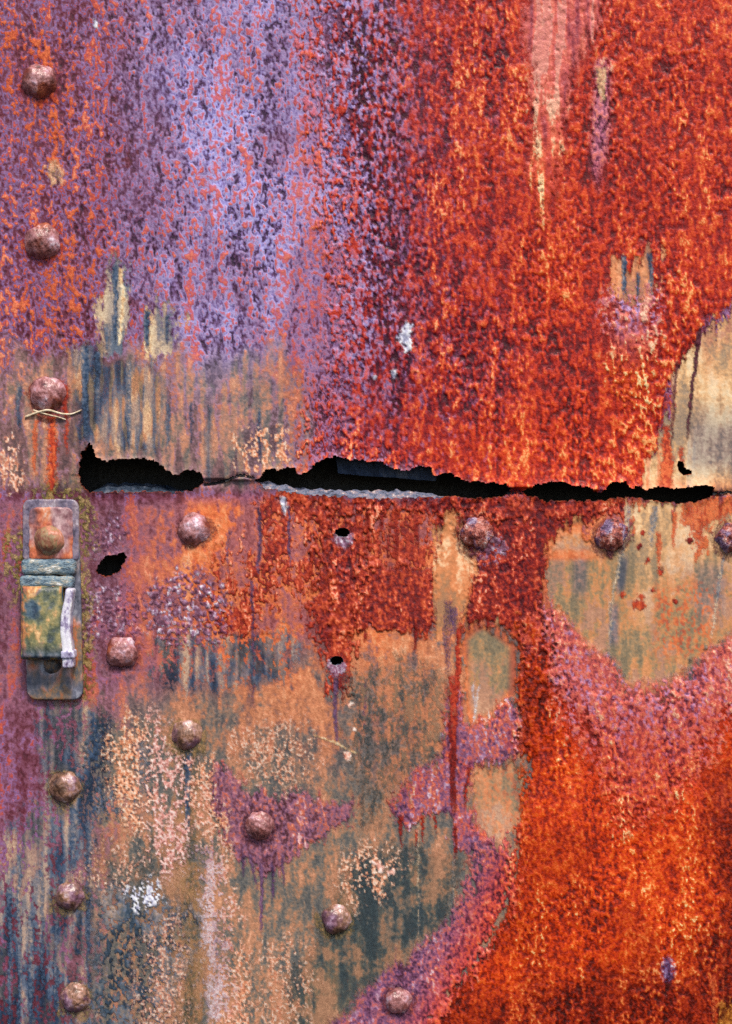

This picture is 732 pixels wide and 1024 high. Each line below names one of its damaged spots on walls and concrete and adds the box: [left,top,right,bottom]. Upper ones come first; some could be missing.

rust [0,12,72,192]
rust [14,210,100,342]
crack [78,442,732,504]
rust [166,0,732,1024]
peeling [544,309,732,684]